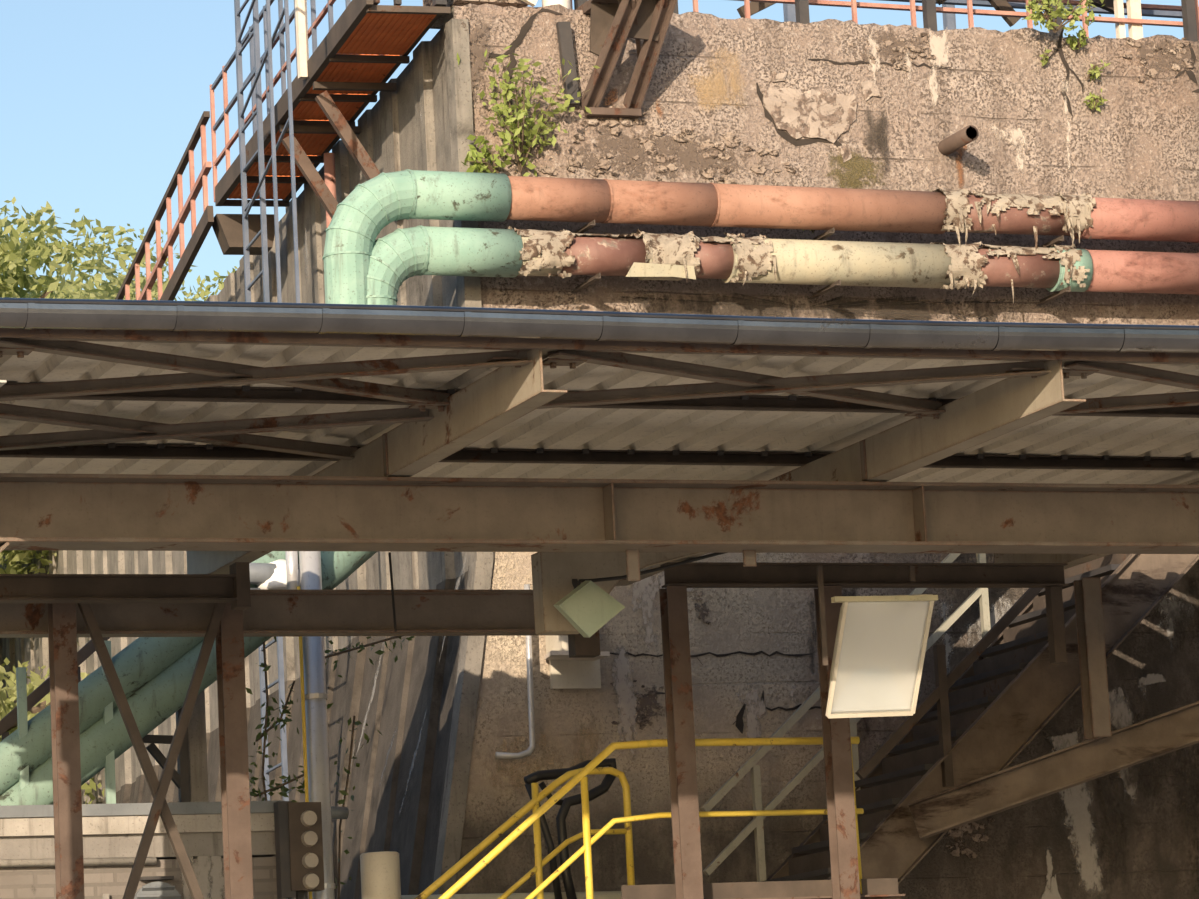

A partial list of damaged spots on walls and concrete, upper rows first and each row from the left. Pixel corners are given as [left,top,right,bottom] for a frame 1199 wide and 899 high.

spalling [849,31,936,72]
spalling [538,71,880,184]
crack [610,651,810,665]
water stain [1108,687,1147,732]
water stain [1050,731,1080,752]
water stain [1059,746,1199,892]